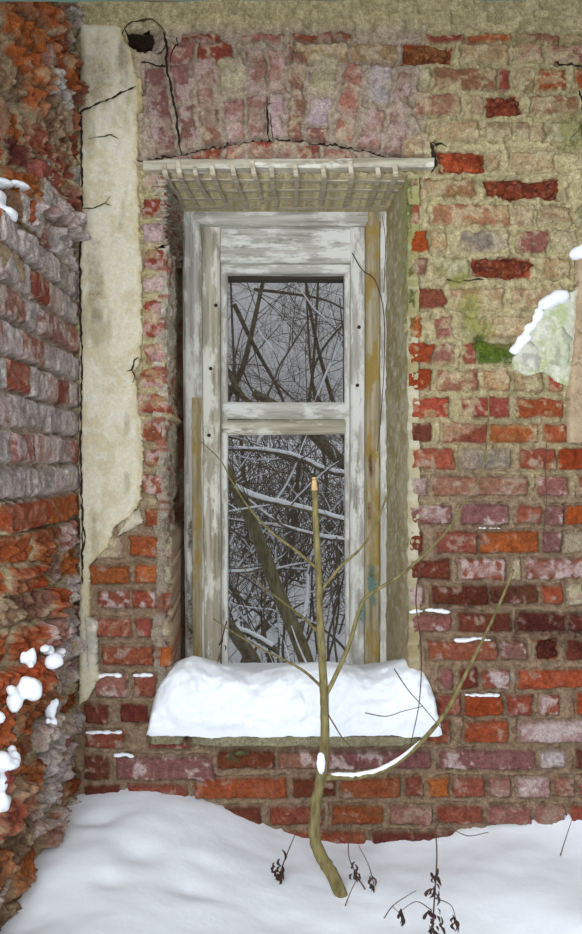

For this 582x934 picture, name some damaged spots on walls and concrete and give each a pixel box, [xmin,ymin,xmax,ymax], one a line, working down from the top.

crack [79,86,136,209]
crack [139,32,389,162]
crack [430,142,447,173]
crack [554,60,582,68]
crack [78,241,86,584]
flaking render [49,18,166,704]